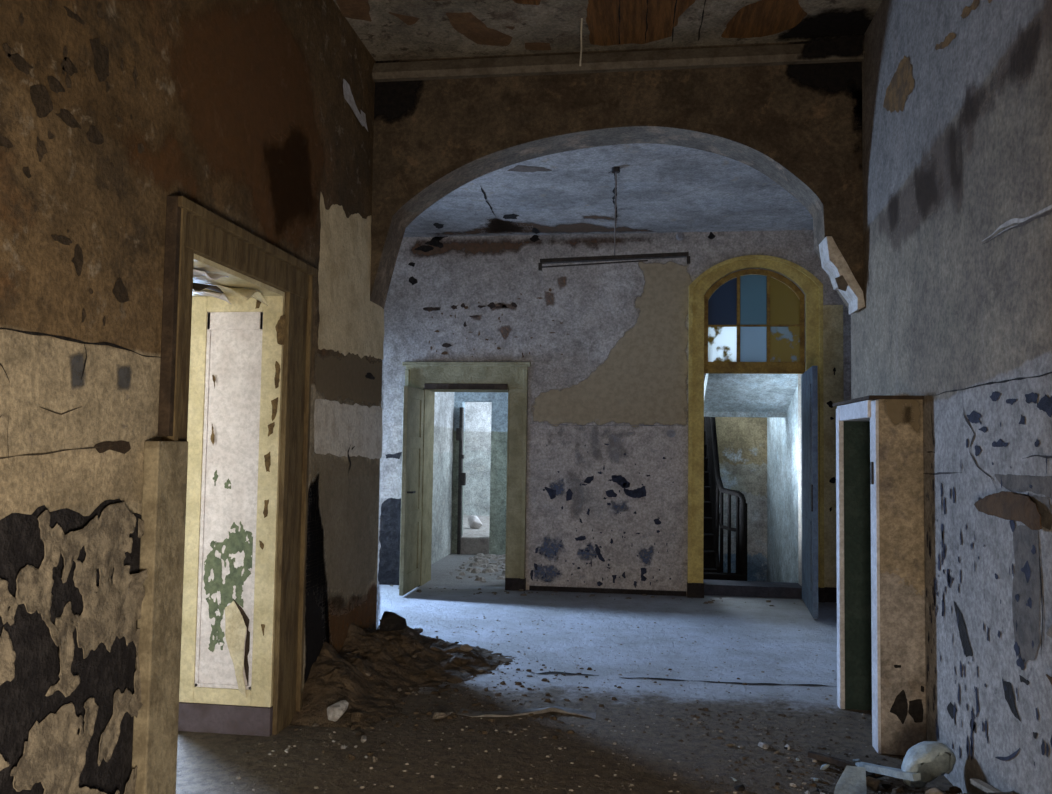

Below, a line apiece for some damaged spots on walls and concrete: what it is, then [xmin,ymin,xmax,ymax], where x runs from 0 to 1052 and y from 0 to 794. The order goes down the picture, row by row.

water stain [879,0,1052,246]
crack [0,443,124,459]
peeling [0,499,148,794]
crack [0,328,161,380]
peeling [203,521,264,697]
peeling [318,193,384,360]
water stain [408,214,654,285]
peeling [530,426,671,588]
peeling [890,463,988,760]
crack [923,372,1052,490]
peeling [974,458,1052,722]
peeling [990,391,1052,417]